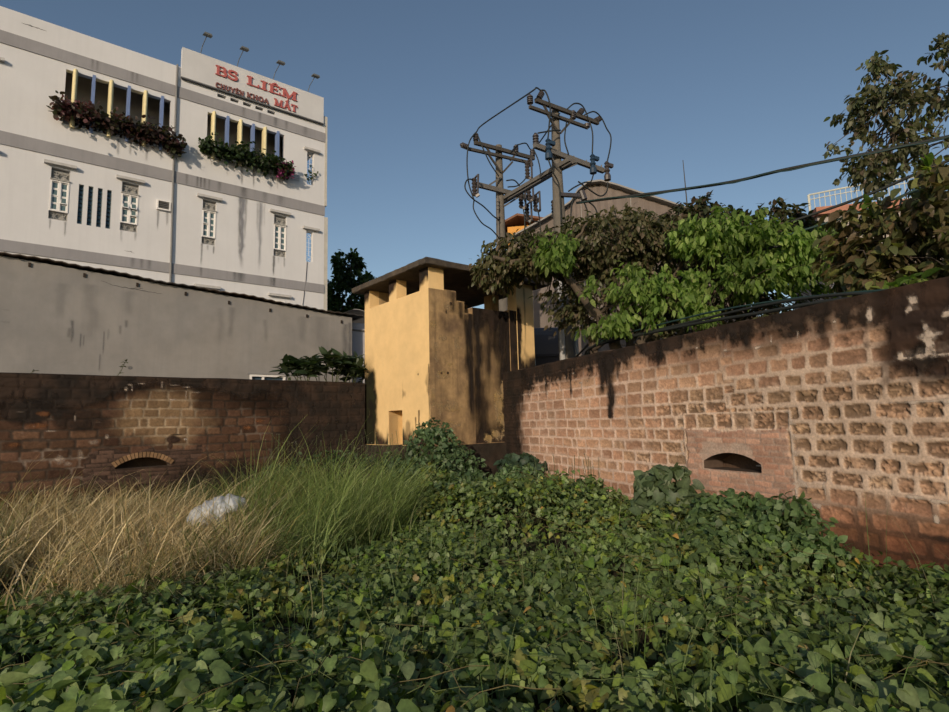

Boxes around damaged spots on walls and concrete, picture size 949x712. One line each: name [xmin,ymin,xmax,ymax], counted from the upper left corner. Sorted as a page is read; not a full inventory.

leakage [0,366,388,497]
leakage [452,276,949,455]